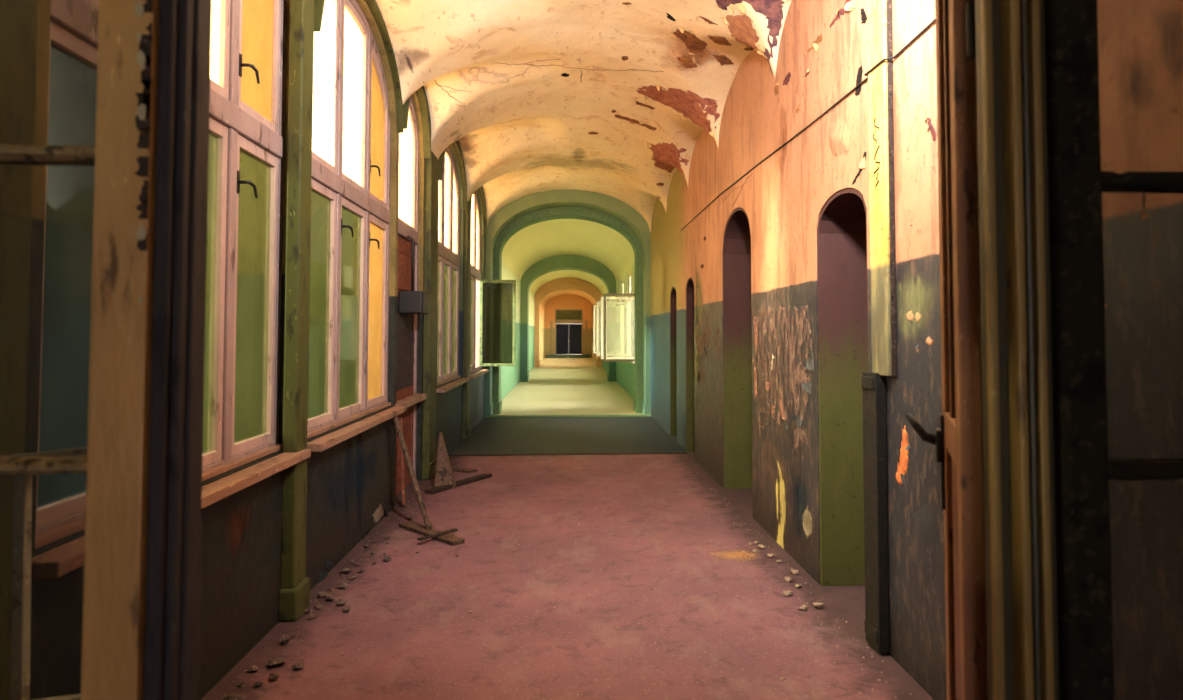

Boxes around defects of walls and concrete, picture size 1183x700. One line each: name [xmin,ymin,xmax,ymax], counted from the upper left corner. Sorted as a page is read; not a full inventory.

flaking render [666,0,867,96]
flaking render [611,85,720,199]